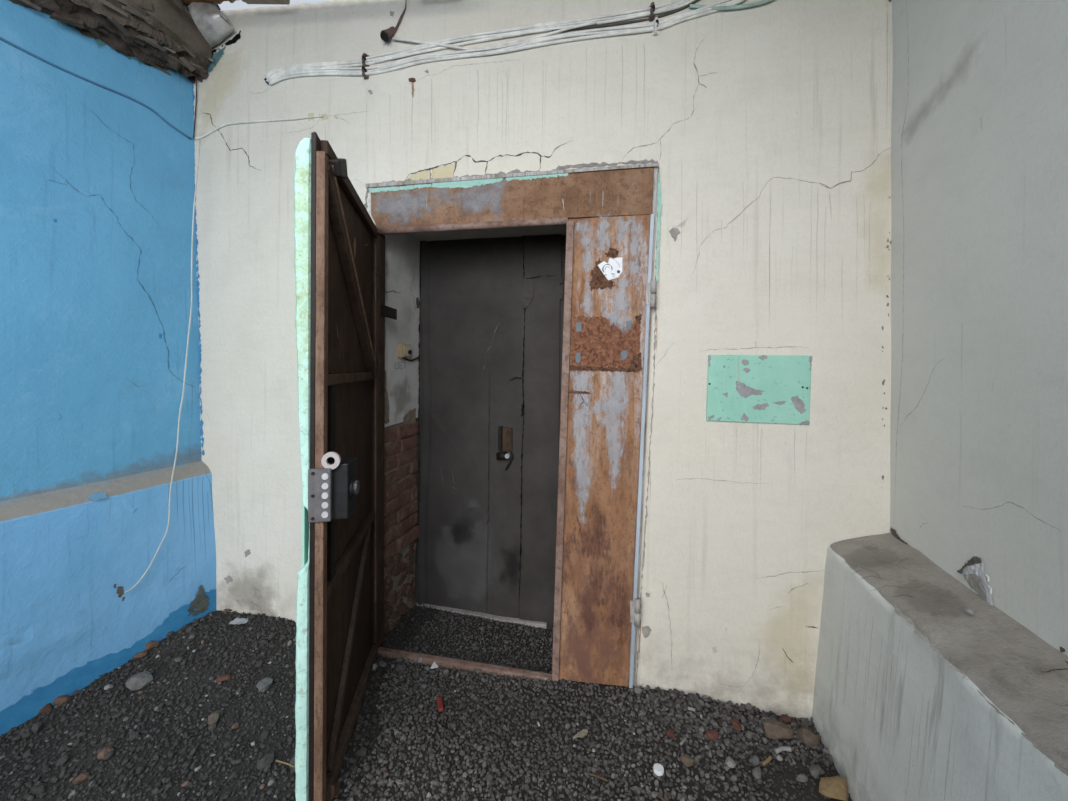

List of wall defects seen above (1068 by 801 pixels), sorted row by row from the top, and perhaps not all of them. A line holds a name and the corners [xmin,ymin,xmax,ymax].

crack [405,141,570,180]
rust [589,248,619,291]
rust [569,314,642,372]
spalling [364,159,680,684]